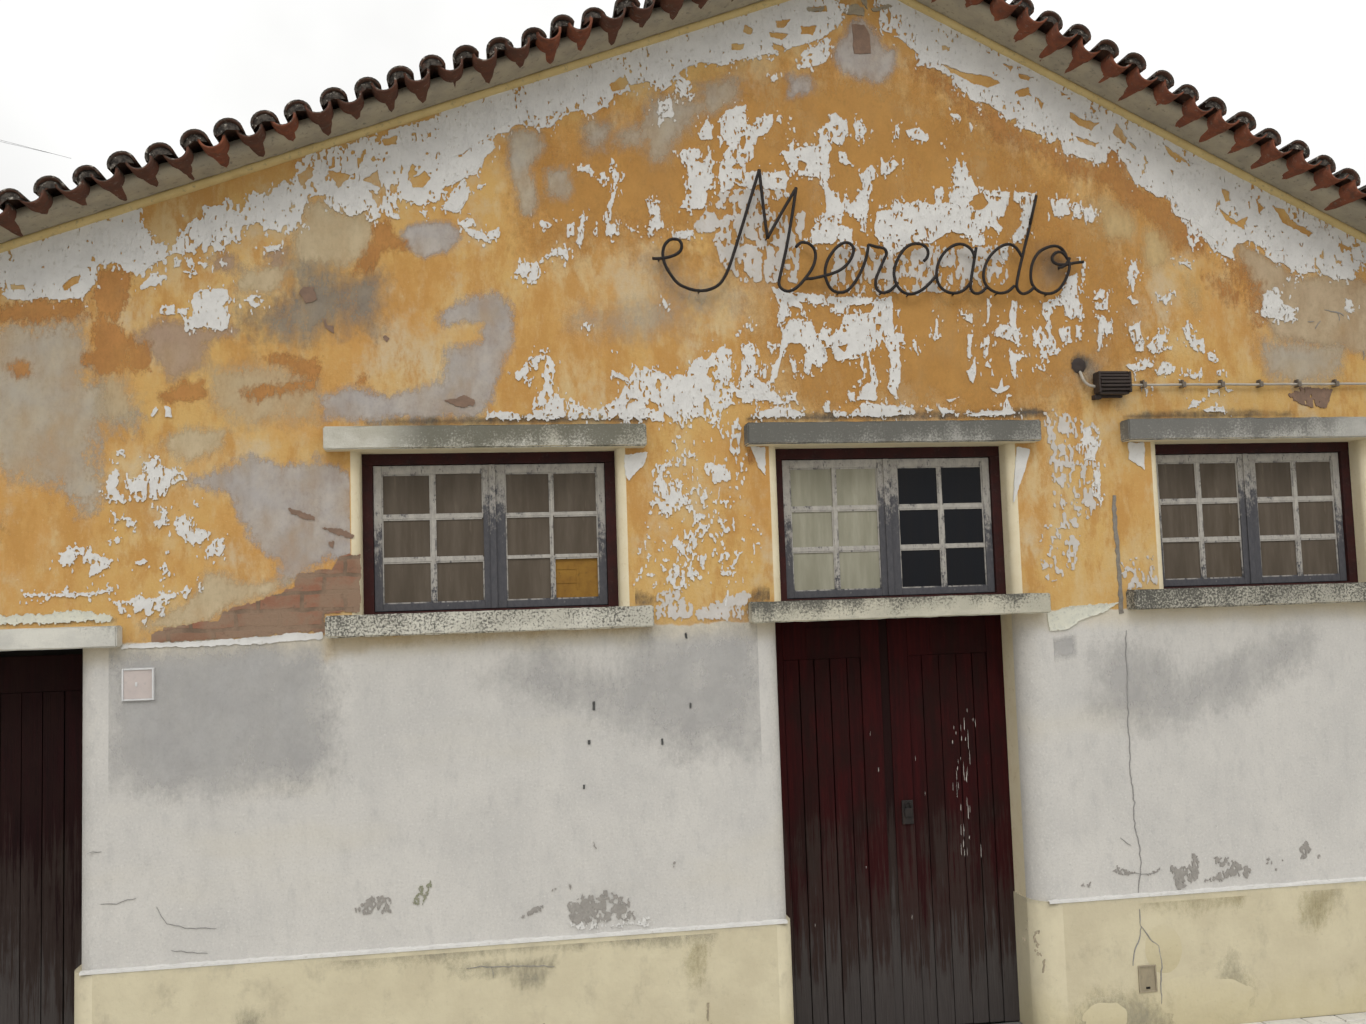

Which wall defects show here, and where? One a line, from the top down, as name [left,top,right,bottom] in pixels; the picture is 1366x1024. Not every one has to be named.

peeling [0,0,1366,643]
crack [1112,495,1163,1004]
spalling [1299,841,1321,859]
spalling [1113,853,1283,890]
spalling [355,895,392,915]
spalling [413,882,432,905]
spalling [552,884,655,932]